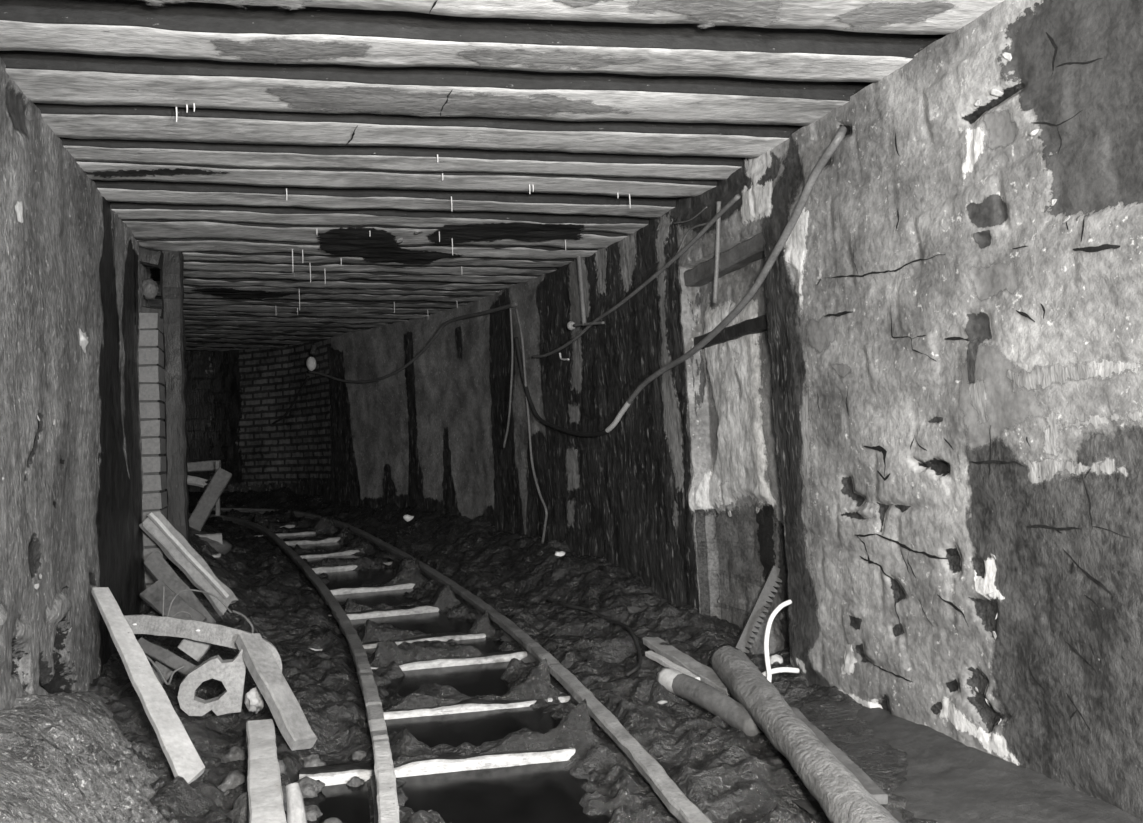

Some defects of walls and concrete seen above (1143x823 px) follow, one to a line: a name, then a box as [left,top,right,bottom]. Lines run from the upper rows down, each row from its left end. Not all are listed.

damp [202,0,312,10]
damp [629,0,783,28]
spalling [962,0,1143,223]
spalling [966,194,1008,249]
crack [1066,217,1120,252]
crack [817,249,945,285]
damp [184,331,462,516]
damp [482,136,835,688]
spalling [919,458,950,476]
crack [864,425,1030,481]
crack [856,534,969,627]
spalling [946,667,1012,737]